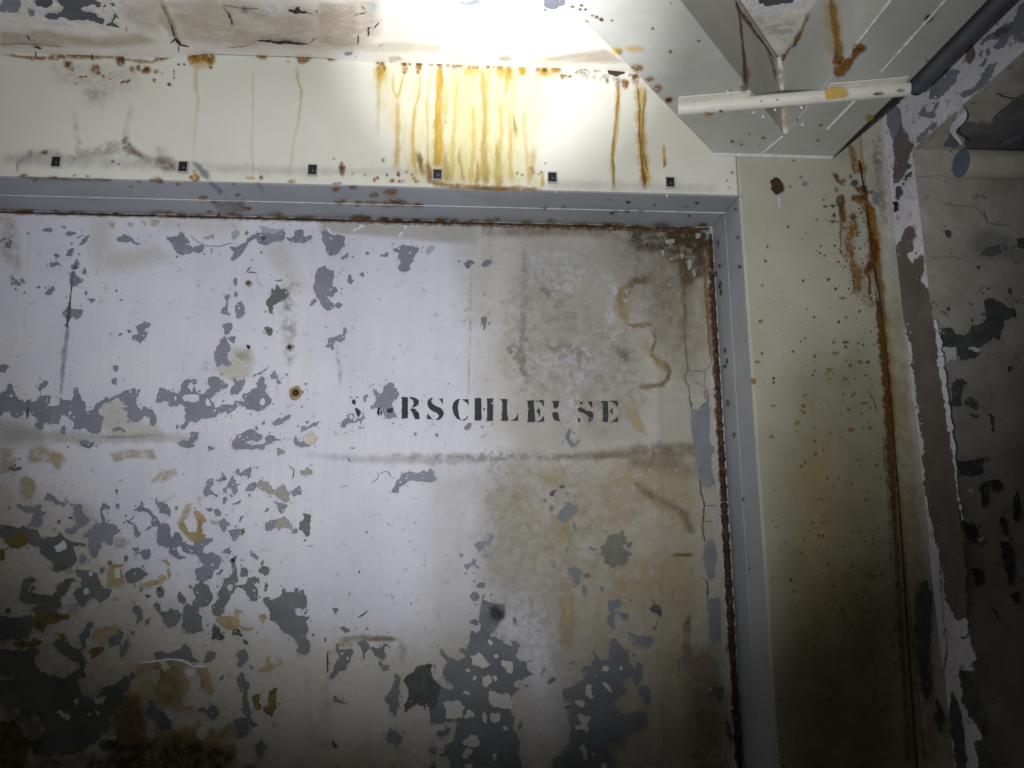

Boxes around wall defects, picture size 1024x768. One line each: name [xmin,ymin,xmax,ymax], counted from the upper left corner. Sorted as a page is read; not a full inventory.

rust [11,54,215,84]
crack [170,24,190,52]
peeling [0,276,320,460]
leakage [0,477,456,768]
peeling [230,225,365,314]
peeling [0,464,667,768]
rust [0,63,743,768]
leakage [494,223,727,768]
crack [684,325,712,409]
crack [699,480,716,542]
rust [751,146,908,768]
spalling [894,225,1024,768]